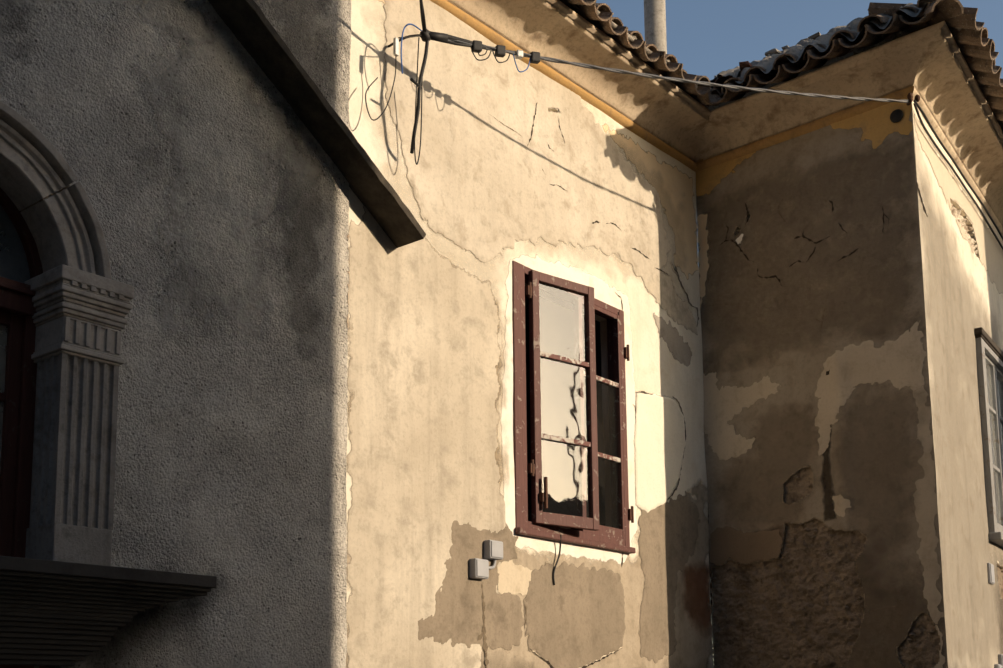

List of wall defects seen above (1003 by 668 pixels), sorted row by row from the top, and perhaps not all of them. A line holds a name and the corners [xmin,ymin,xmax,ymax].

peeling [346,0,867,668]
crack [592,220,699,326]
crack [719,200,857,287]
peeling [815,320,945,668]